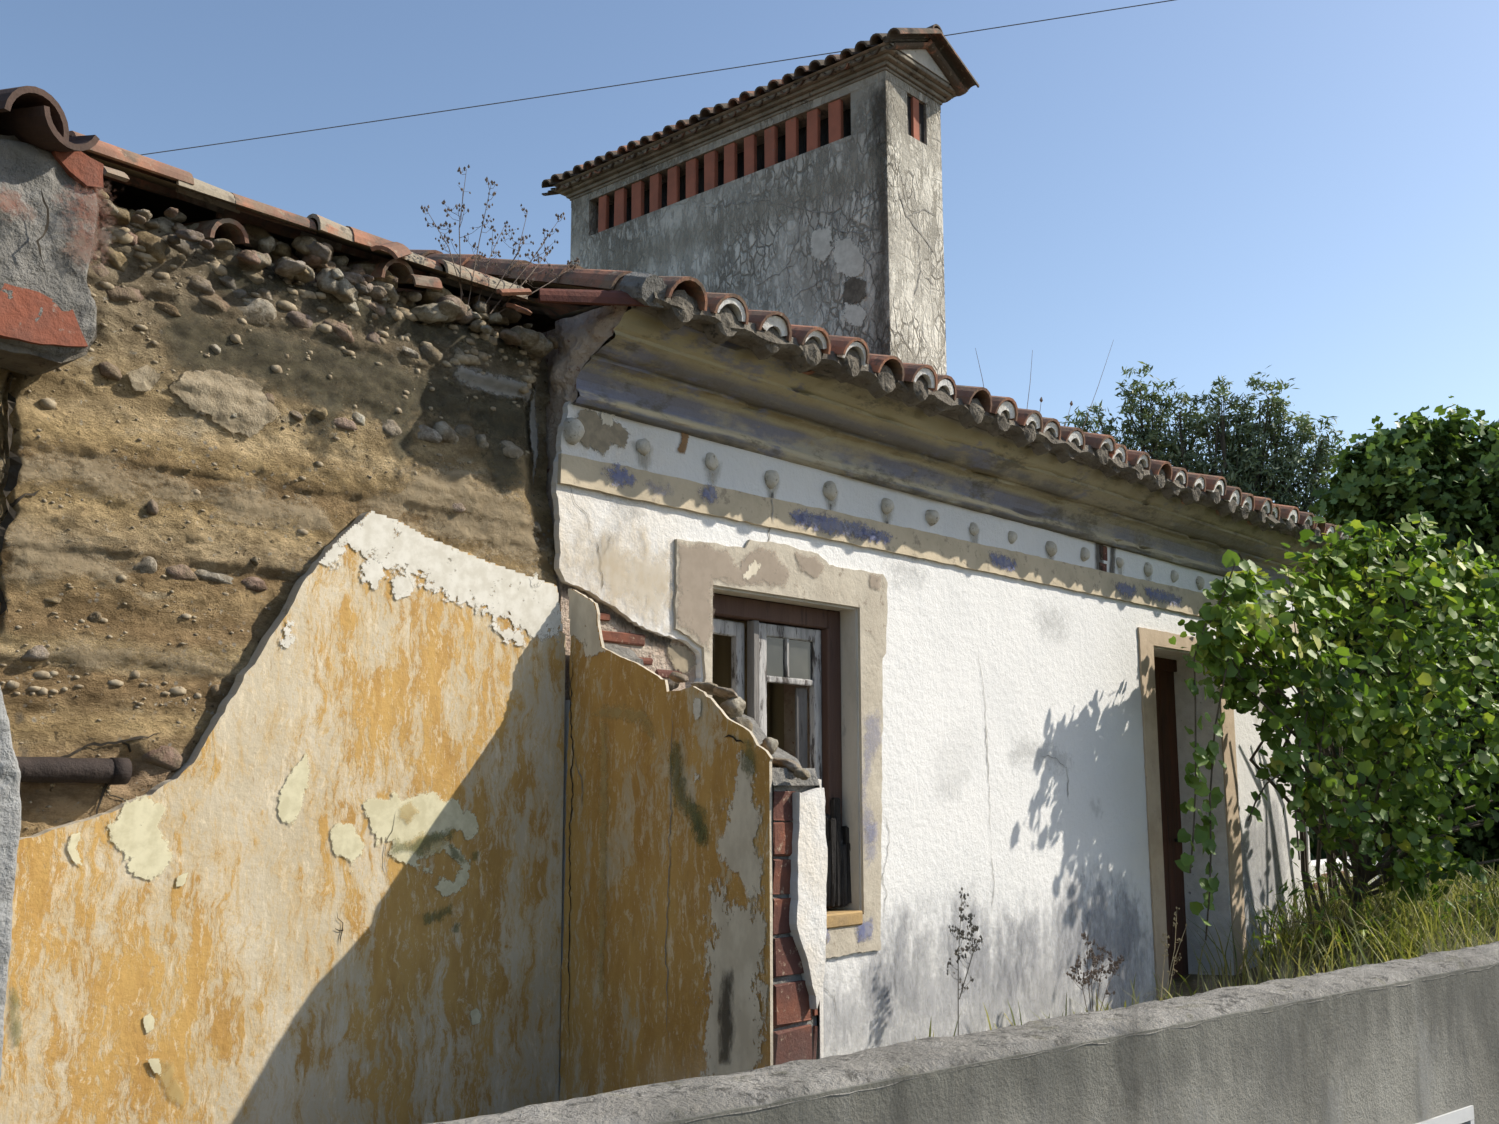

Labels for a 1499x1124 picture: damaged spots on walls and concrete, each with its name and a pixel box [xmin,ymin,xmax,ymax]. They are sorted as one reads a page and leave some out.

crack [714,173,941,352]
flaking render [127,364,281,438]
peeling [0,452,824,678]
peeling [870,574,881,590]
peeling [278,753,310,824]
peeling [67,832,83,866]
peeling [106,795,188,887]
peeling [330,791,479,897]
peeling [695,750,768,1077]